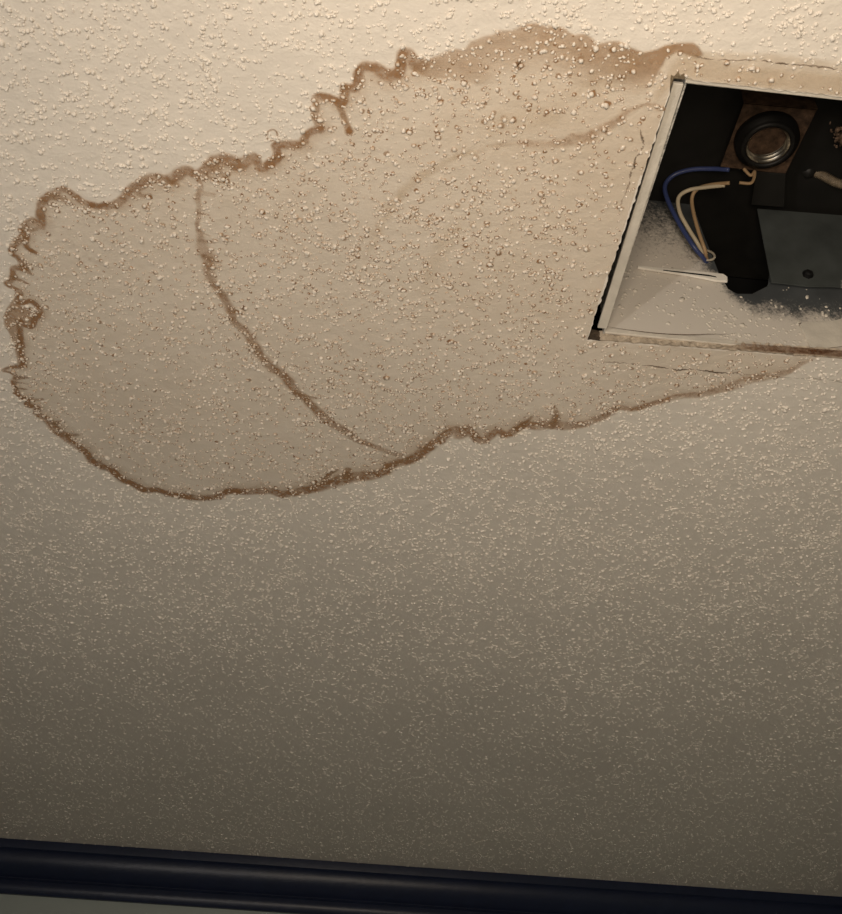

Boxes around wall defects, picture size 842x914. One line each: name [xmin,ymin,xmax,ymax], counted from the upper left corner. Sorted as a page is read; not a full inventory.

water stain [3,23,812,501]